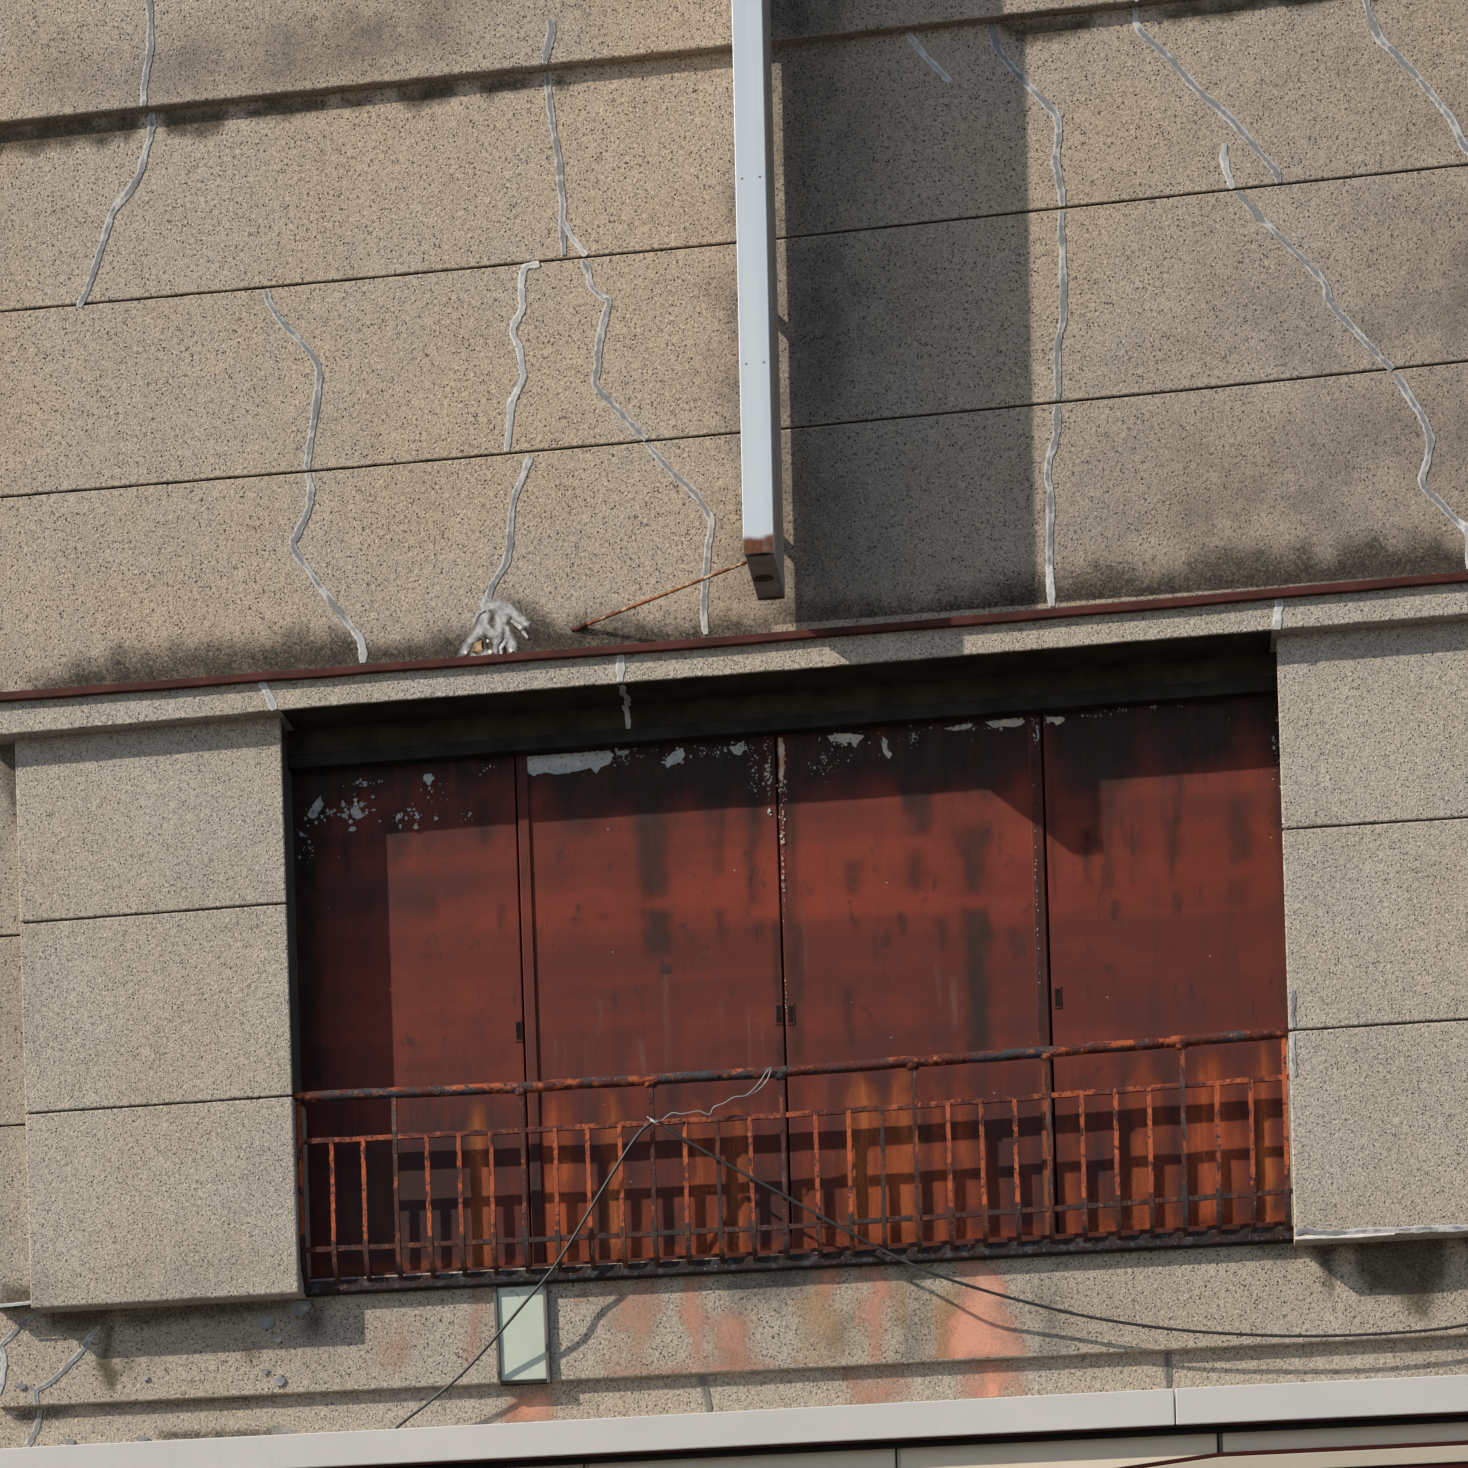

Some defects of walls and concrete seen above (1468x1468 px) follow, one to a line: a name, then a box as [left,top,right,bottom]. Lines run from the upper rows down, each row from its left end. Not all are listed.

leakage [0,116,137,152]
leakage [400,86,454,107]
crack [478,19,715,634]
crack [989,23,1067,606]
crack [1132,0,1468,569]
leakage [34,611,750,690]
peeling [296,774,447,863]
peeling [527,738,787,891]
peeling [808,708,1132,783]
rust [832,1081,916,1245]
rust [1187,1061,1241,1226]
rust [938,1260,1024,1398]